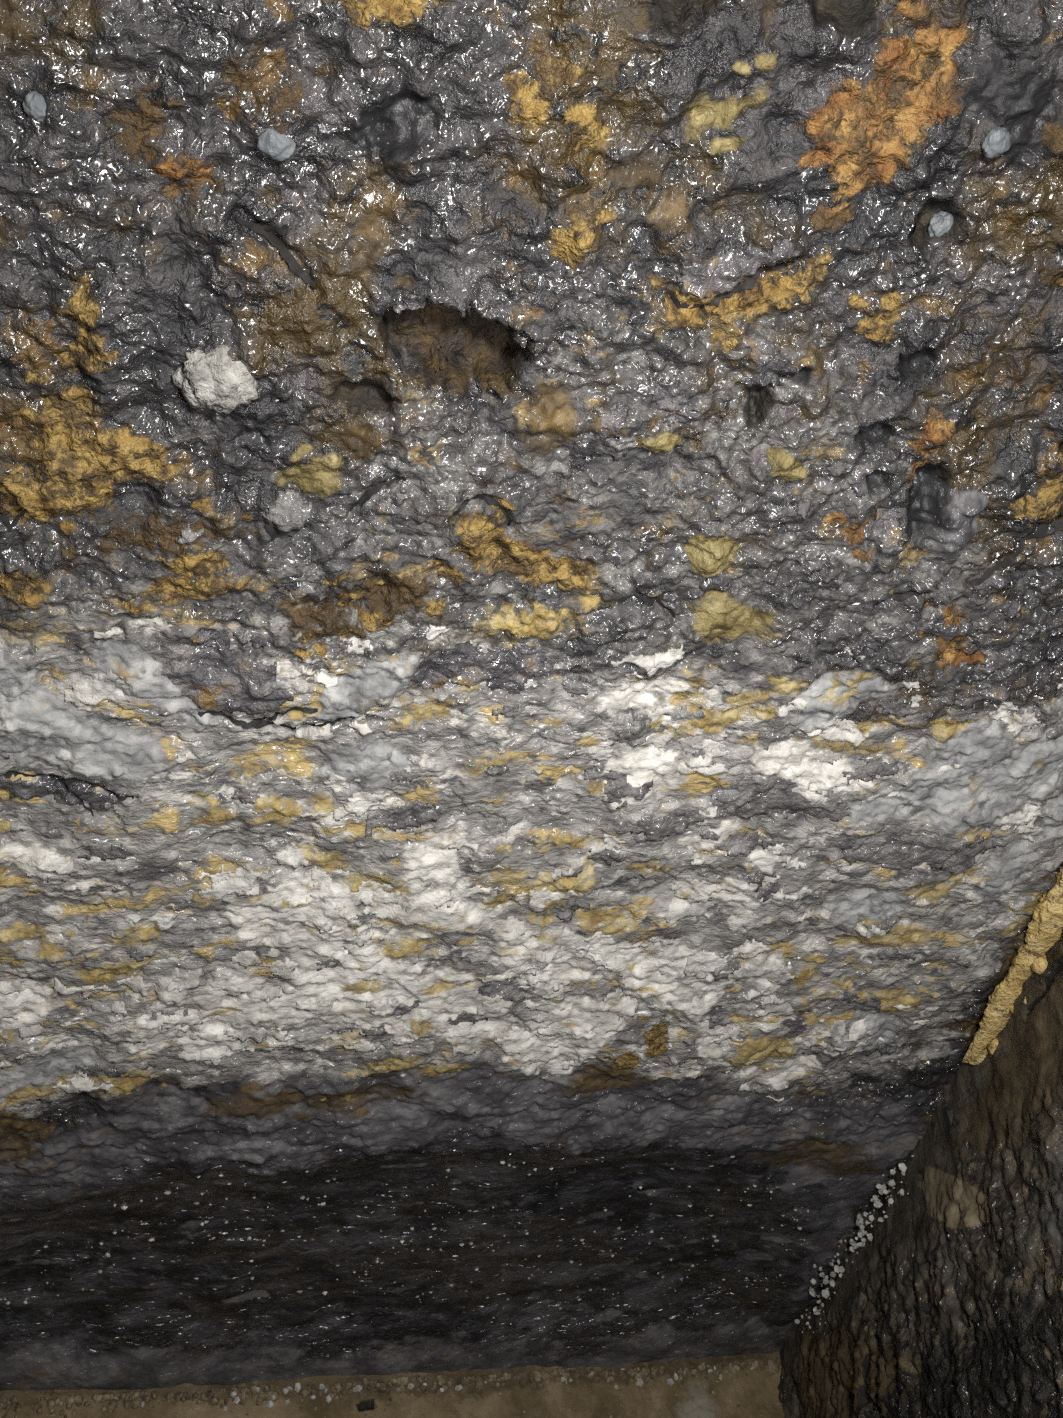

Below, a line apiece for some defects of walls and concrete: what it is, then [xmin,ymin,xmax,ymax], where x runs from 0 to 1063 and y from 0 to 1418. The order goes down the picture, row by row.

rust [316,0,447,38]
rust [648,0,975,352]
peeling [676,237,800,299]
peeling [382,298,426,316]
rust [0,271,259,615]
peeling [591,435,638,461]
peeling [176,527,204,545]
peeling [263,489,312,532]
rust [1008,449,1063,530]
damp [0,260,1063,1154]
rust [964,1001,988,1050]
damp [151,1152,1063,1418]